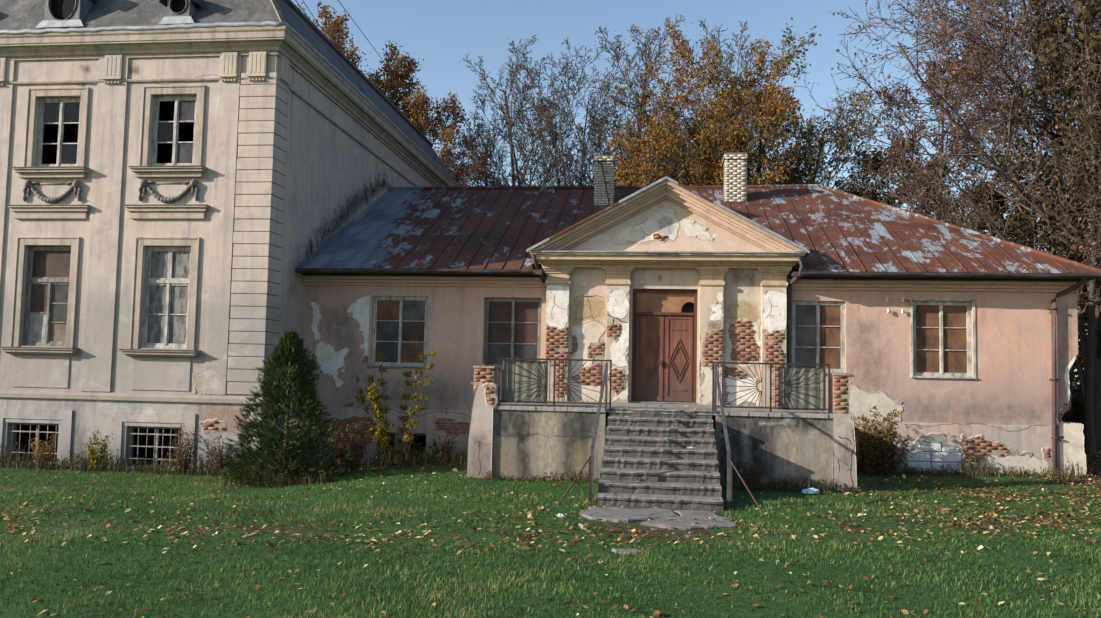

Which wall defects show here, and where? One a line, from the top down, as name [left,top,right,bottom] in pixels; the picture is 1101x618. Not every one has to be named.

flaking render [612,207,716,244]
flaking render [309,293,370,388]
flaking render [433,416,470,437]
flaking render [471,363,499,409]
flaking render [545,284,629,402]
flaking render [699,288,787,406]
flaking render [849,381,904,471]
flaking render [958,357,1077,474]